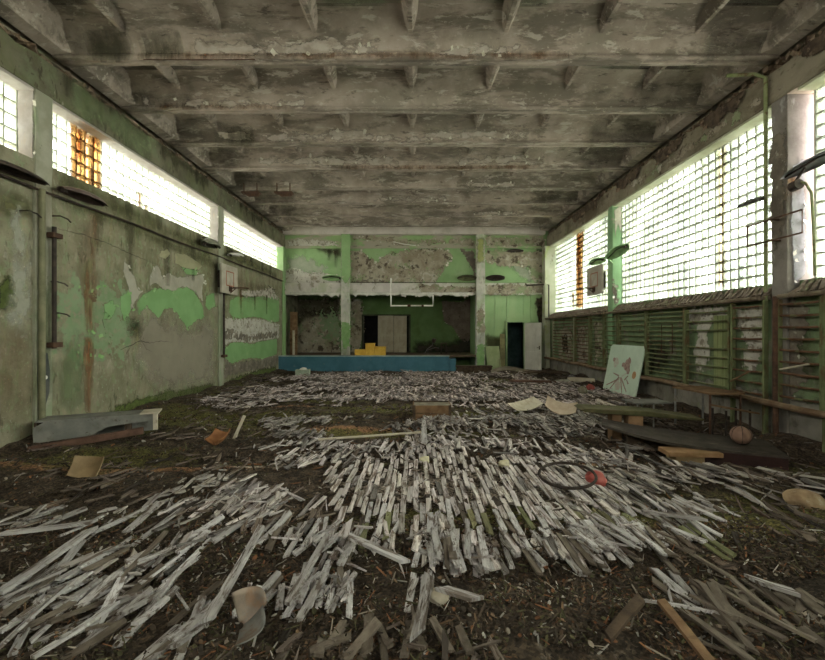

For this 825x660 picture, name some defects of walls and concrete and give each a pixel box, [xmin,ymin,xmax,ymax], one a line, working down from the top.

spalling [195,37,379,56]
spalling [441,45,519,57]
spalling [790,28,825,57]
peeling [614,207,623,235]
spalling [768,128,808,285]
peeling [52,261,217,373]
peeling [224,287,280,378]
flaking render [286,234,546,365]
rust [572,230,584,309]
flaking render [689,305,762,375]